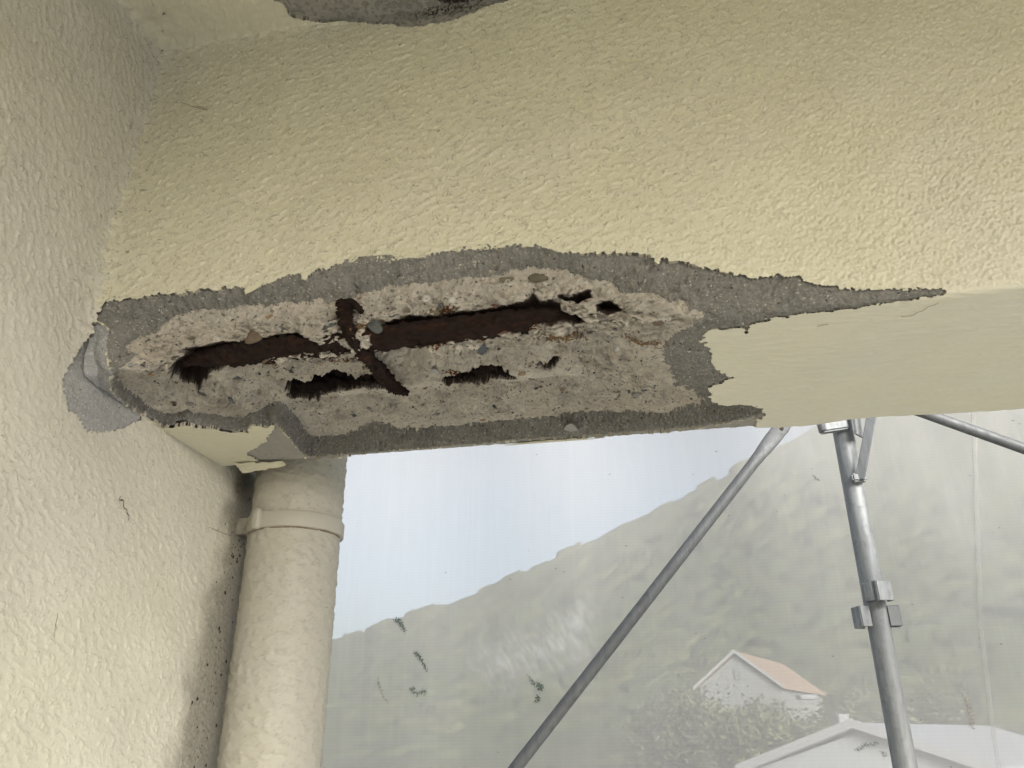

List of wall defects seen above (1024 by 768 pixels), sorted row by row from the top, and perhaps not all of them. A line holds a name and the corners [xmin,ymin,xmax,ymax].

flaking render [274,0,508,27]
spalling [62,243,947,473]